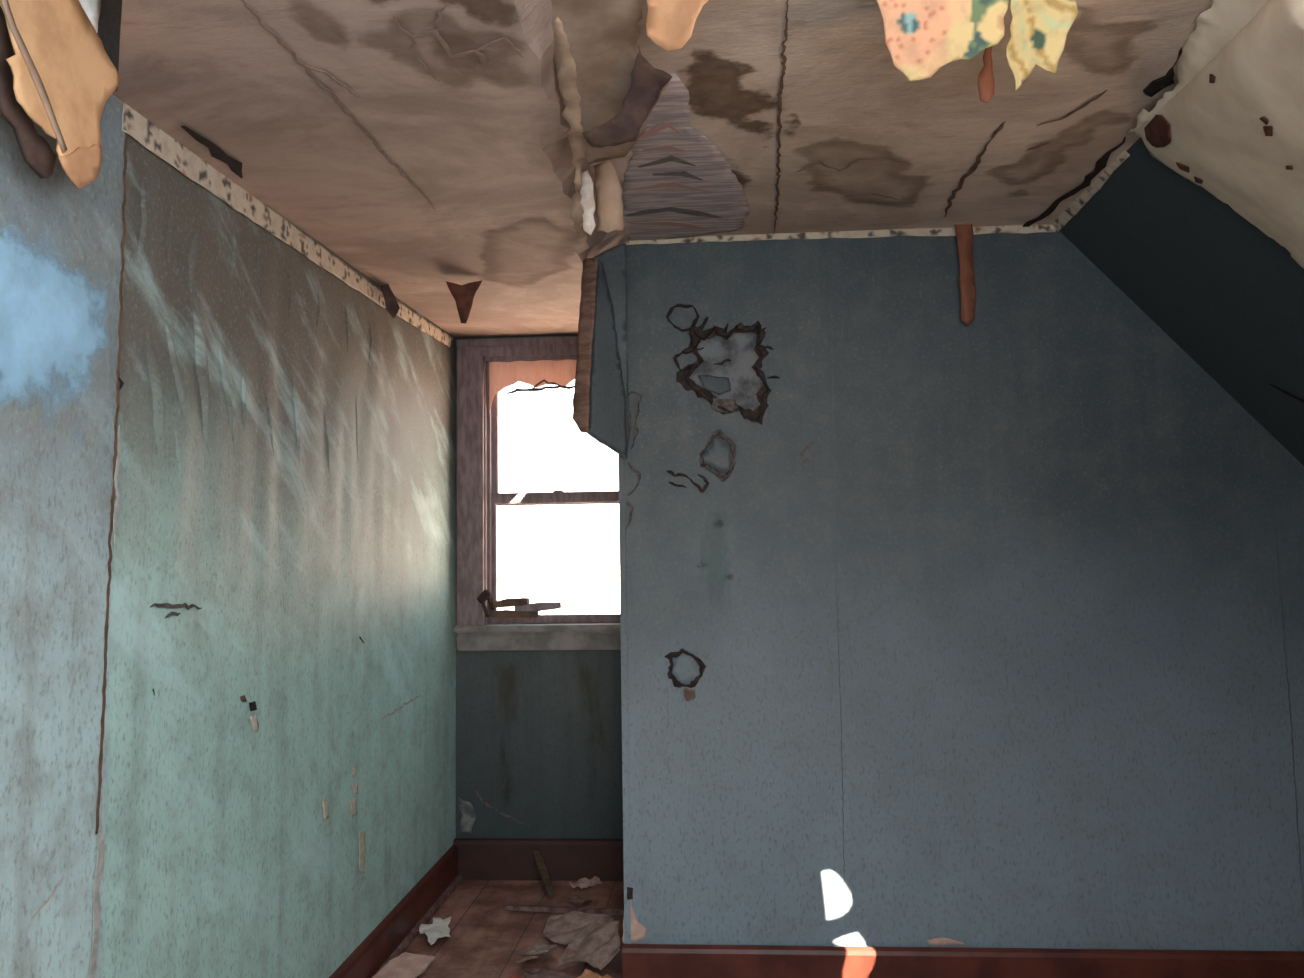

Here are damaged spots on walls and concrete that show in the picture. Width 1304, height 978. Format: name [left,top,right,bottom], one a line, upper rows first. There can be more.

crack [241,0,435,209]
leakage [687,51,777,133]
crack [774,0,910,233]
crack [944,90,1107,217]
crack [1023,137,1126,227]
peeling [0,230,106,403]
peeling [666,304,780,493]
peeling [664,648,706,701]